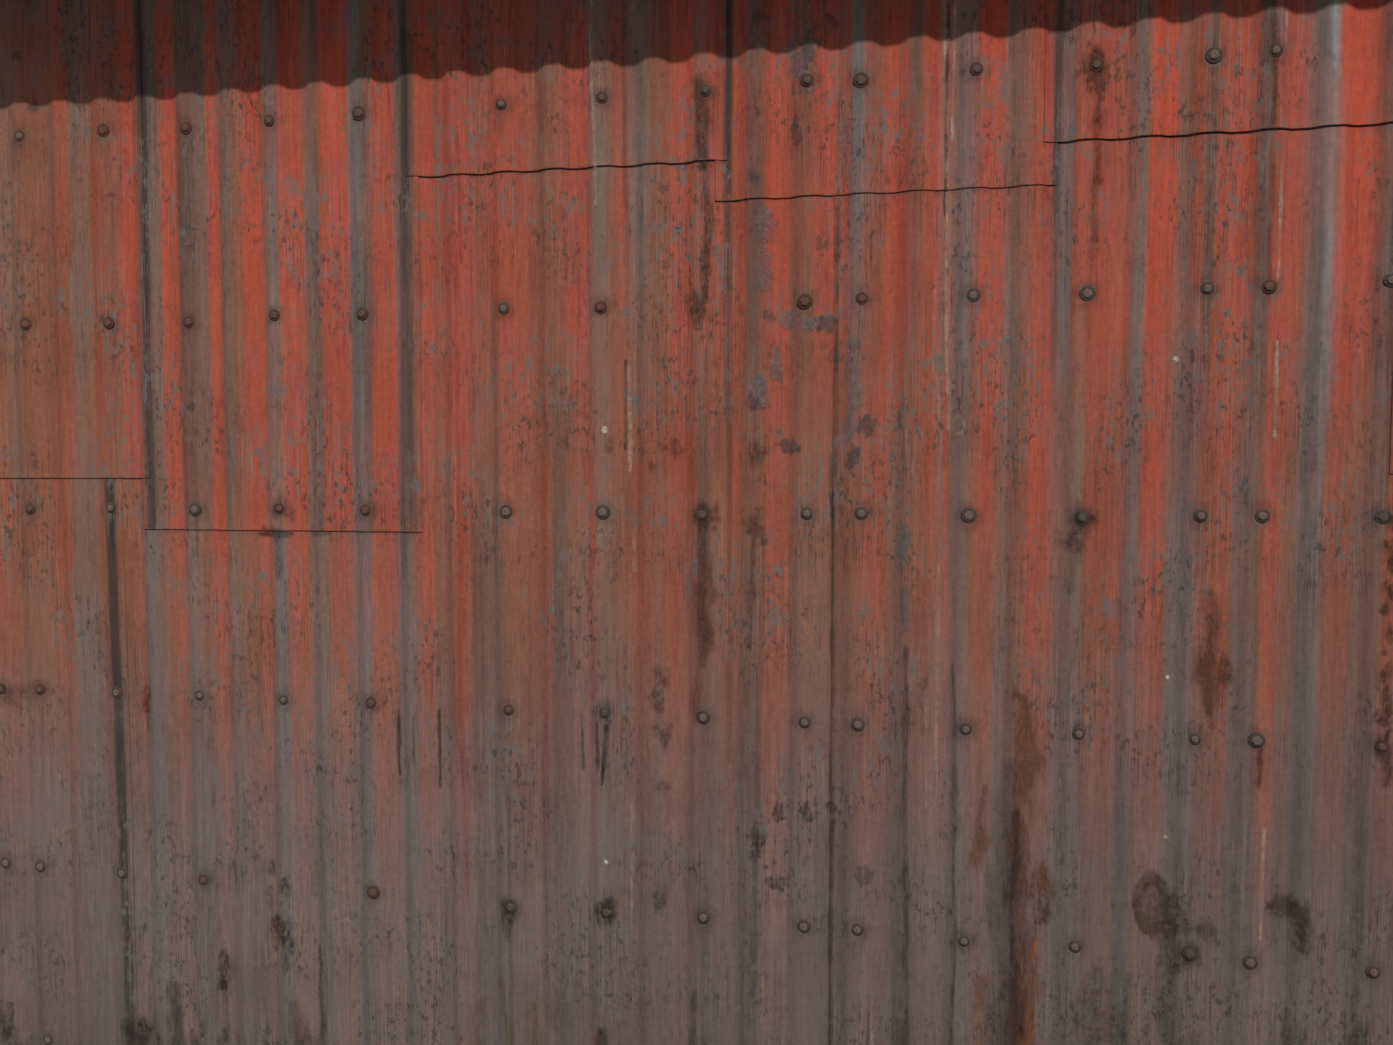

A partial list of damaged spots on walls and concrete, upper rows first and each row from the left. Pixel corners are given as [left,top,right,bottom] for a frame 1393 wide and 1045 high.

corrosion [1005,695,1052,1045]
corrosion [1133,875,1185,940]